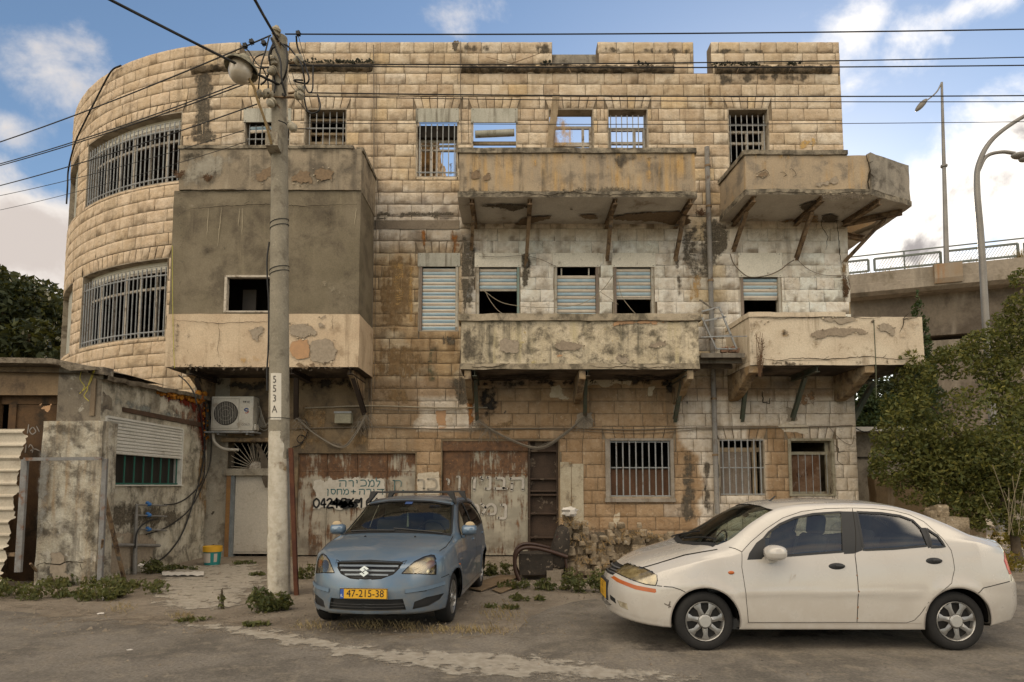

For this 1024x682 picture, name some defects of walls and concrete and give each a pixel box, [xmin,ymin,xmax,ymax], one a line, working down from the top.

leakage [183,73,230,182]
crack [752,155,874,196]
leakage [380,256,413,330]
leakage [581,211,728,299]